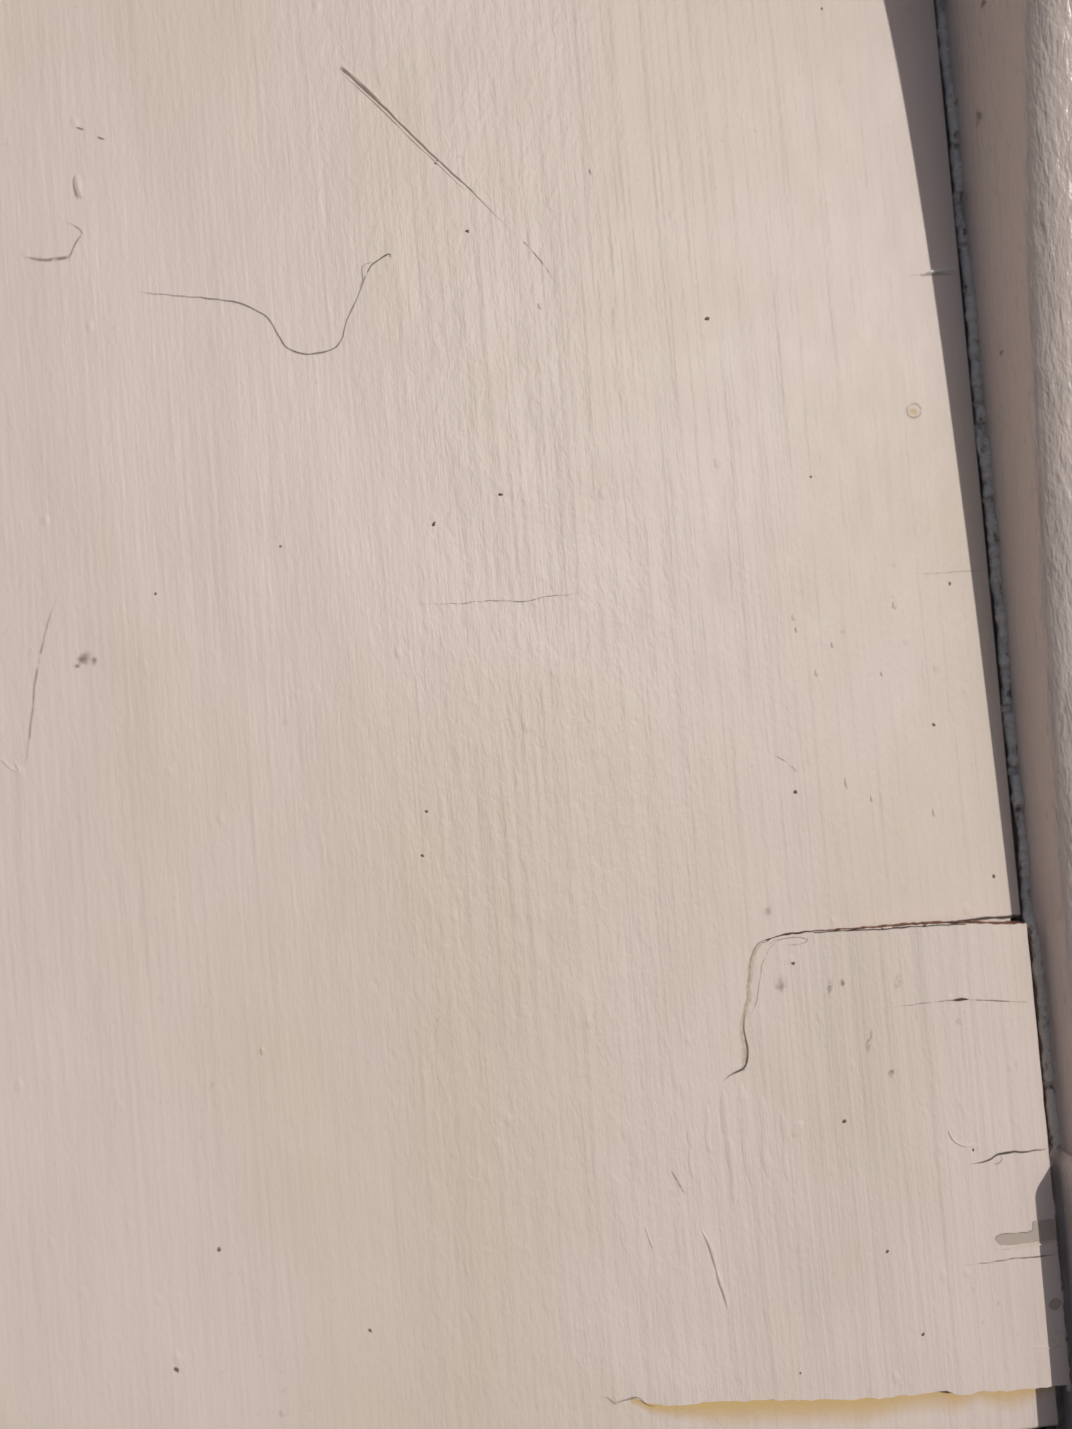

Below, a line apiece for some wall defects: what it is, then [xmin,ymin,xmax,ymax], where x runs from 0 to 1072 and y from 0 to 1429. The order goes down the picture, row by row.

crack [245,305,334,354]